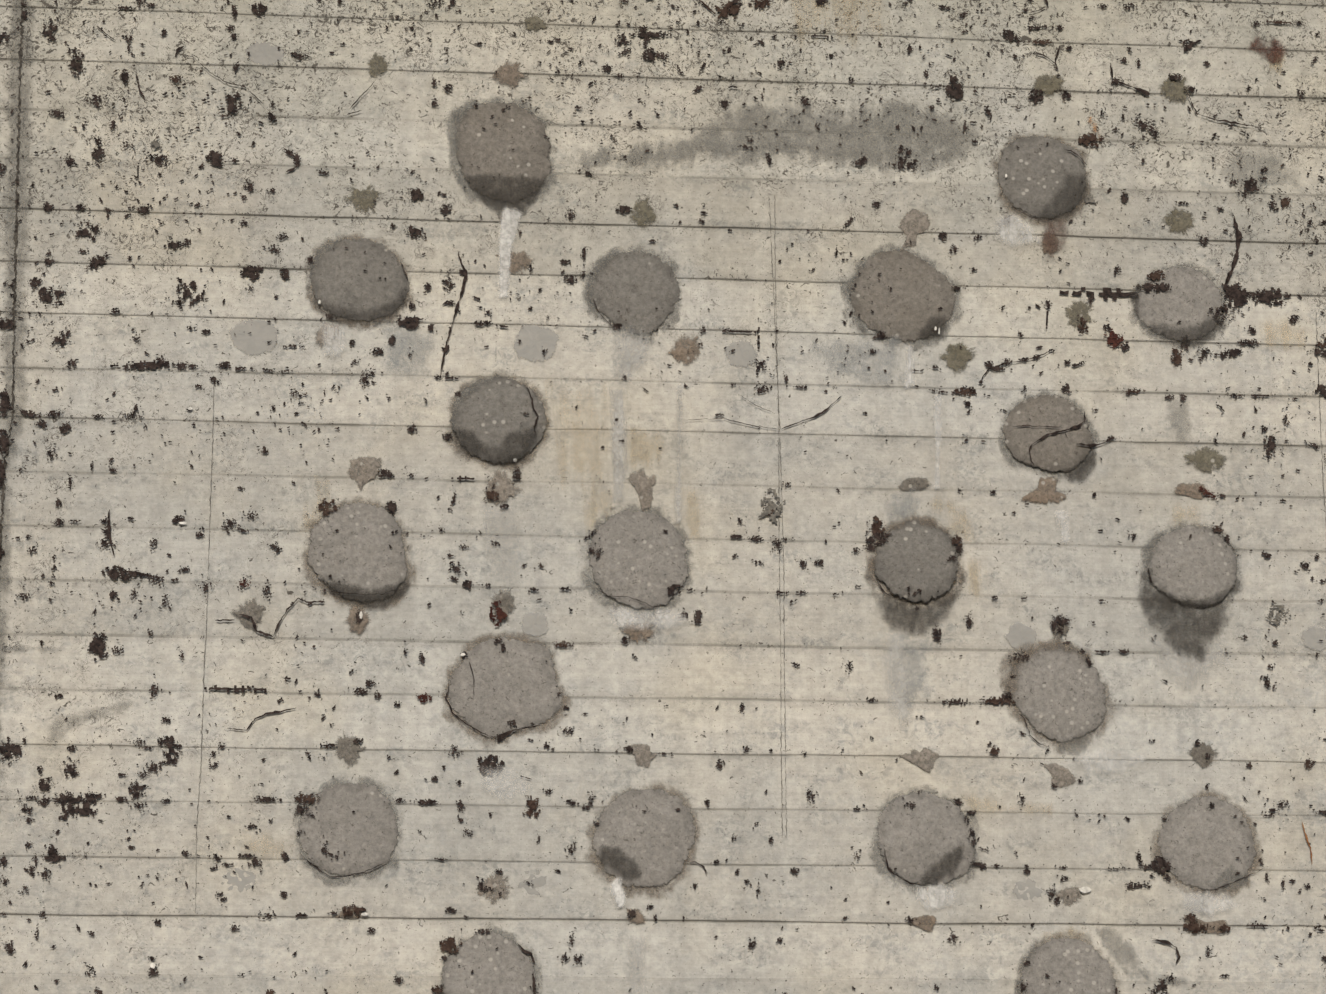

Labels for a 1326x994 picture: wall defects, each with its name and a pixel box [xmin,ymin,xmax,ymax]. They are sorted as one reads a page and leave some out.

damp [627,101,974,170]
crack [1013,411,1109,465]
damp [1141,542,1236,680]